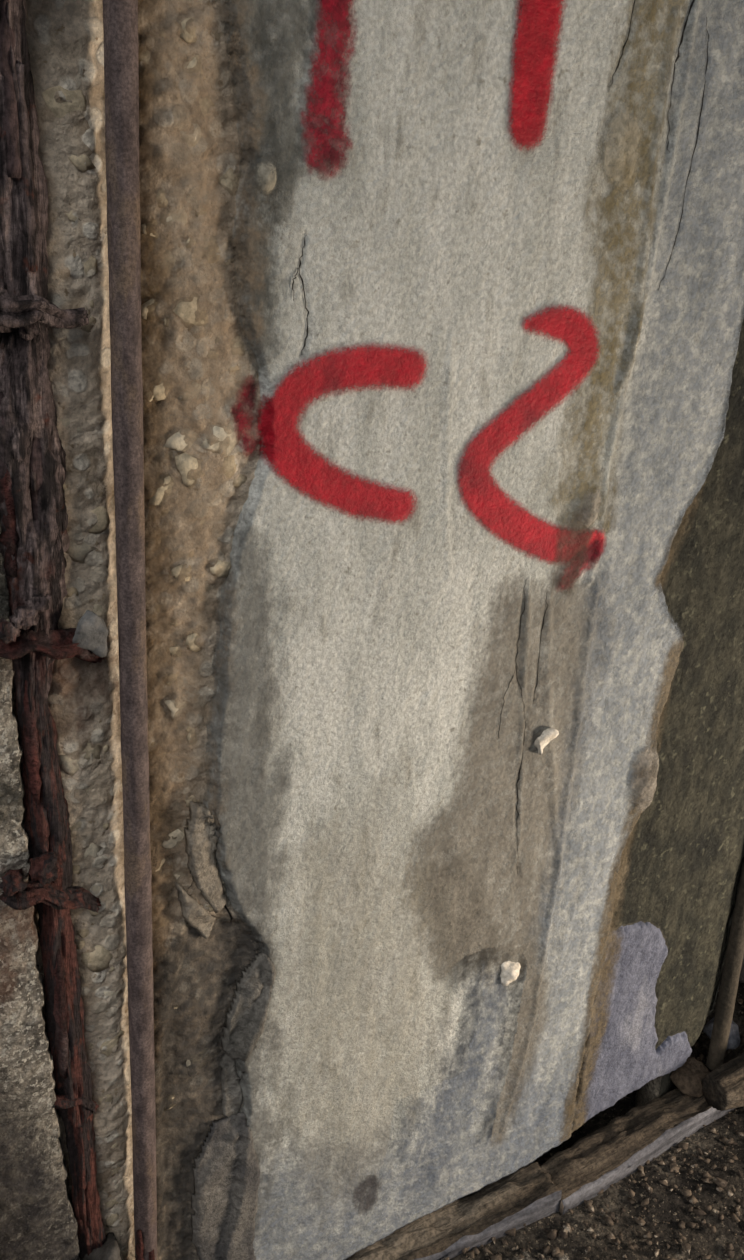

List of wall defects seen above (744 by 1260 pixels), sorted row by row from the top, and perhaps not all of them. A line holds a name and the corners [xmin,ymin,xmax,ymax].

rust [0,0,38,272]
rust [29,436,51,520]
spalling [25,0,135,1260]
spalling [138,0,276,1260]
leakage [151,0,744,1260]
rust [21,680,50,854]
rust [53,948,69,1079]